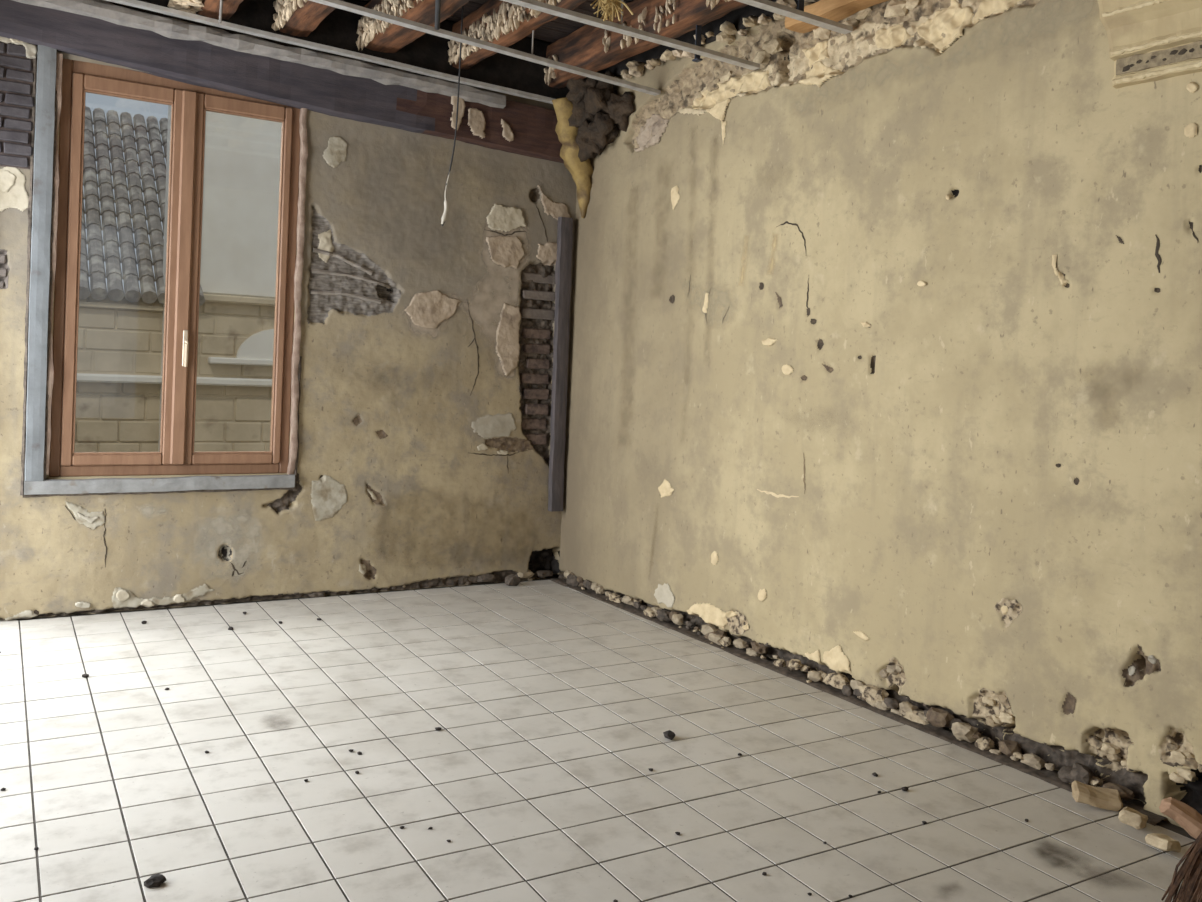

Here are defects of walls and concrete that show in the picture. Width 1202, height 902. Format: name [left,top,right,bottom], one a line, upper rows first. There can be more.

peeling [307,185,571,468]
peeling [263,473,347,521]
spalling [366,484,385,506]
spalling [0,548,1202,839]